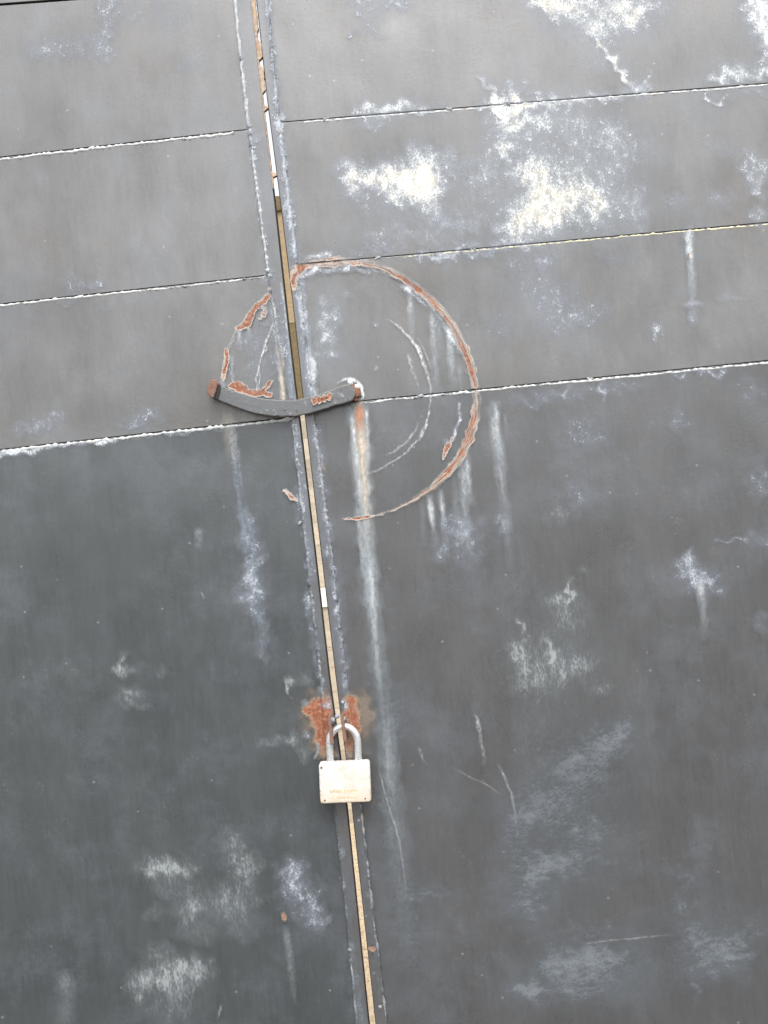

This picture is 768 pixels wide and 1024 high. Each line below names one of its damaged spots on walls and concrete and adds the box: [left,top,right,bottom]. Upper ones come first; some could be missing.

damp [527,0,665,97]
damp [704,0,768,106]
damp [352,100,428,128]
damp [333,145,463,238]
damp [416,78,646,338]
rust [290,252,480,520]
damp [351,407,369,529]
damp [511,621,592,689]
rust [302,694,374,758]
damp [145,856,197,881]
damp [282,859,323,925]
damp [130,954,206,1011]